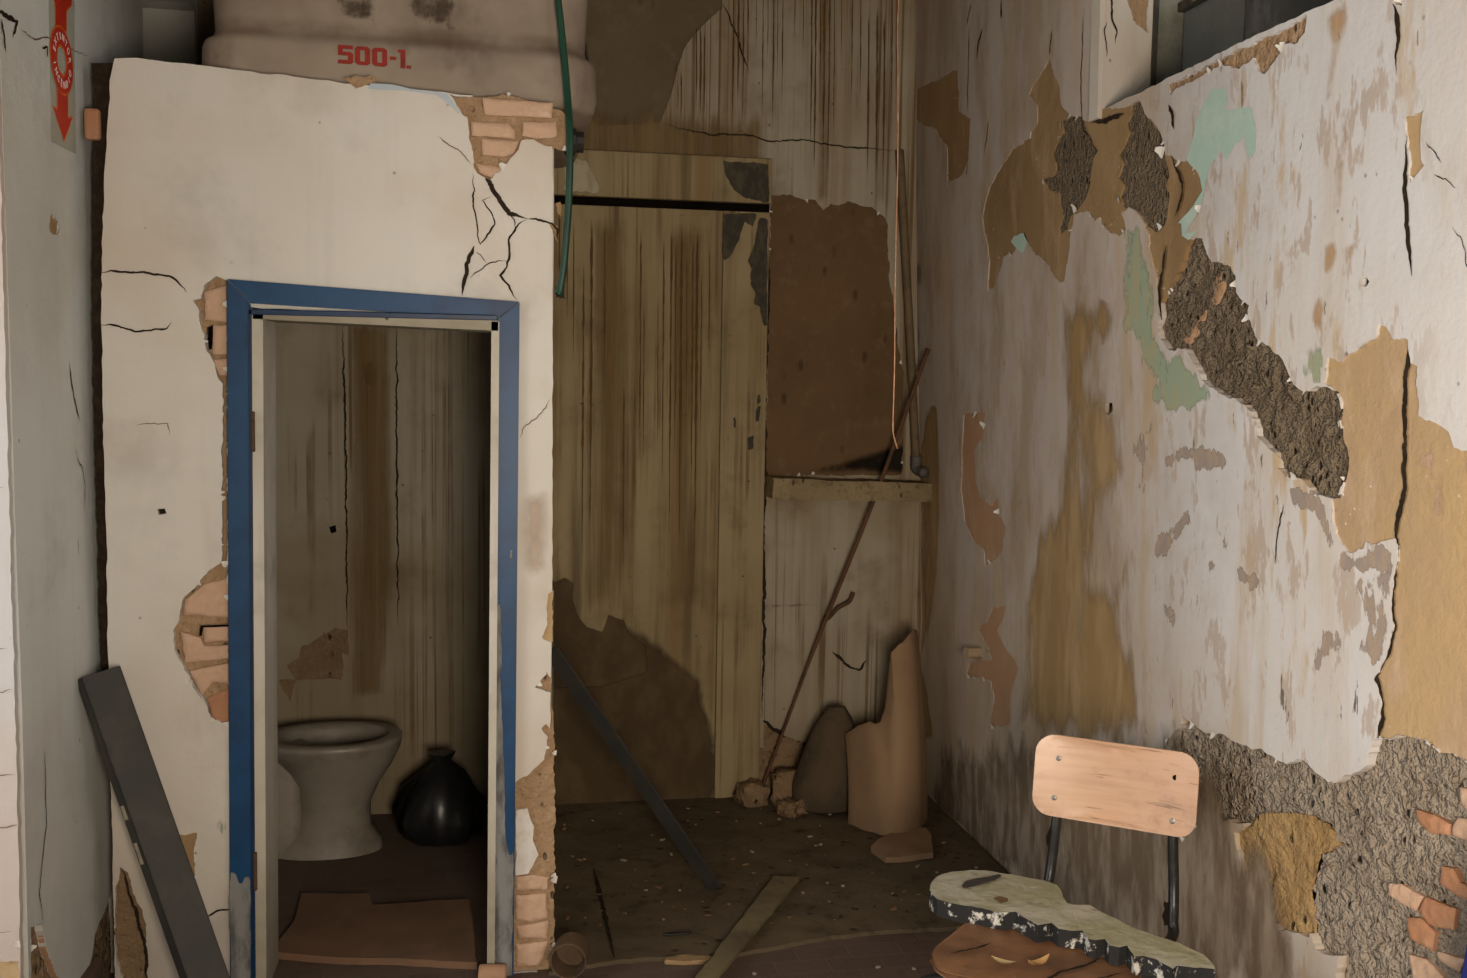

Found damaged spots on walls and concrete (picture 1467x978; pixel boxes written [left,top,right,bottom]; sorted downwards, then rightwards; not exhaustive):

flaking render [175,277,229,728]
crack [393,329,401,626]
crack [440,137,559,298]
leakage [598,228,634,583]
leakage [584,114,758,158]
leakage [677,237,696,446]
spalling [722,161,903,476]
spalling [981,61,1467,978]
crack [1374,352,1411,738]
crack [0,753,47,933]
flaking render [495,578,647,976]
leakage [935,741,1291,978]